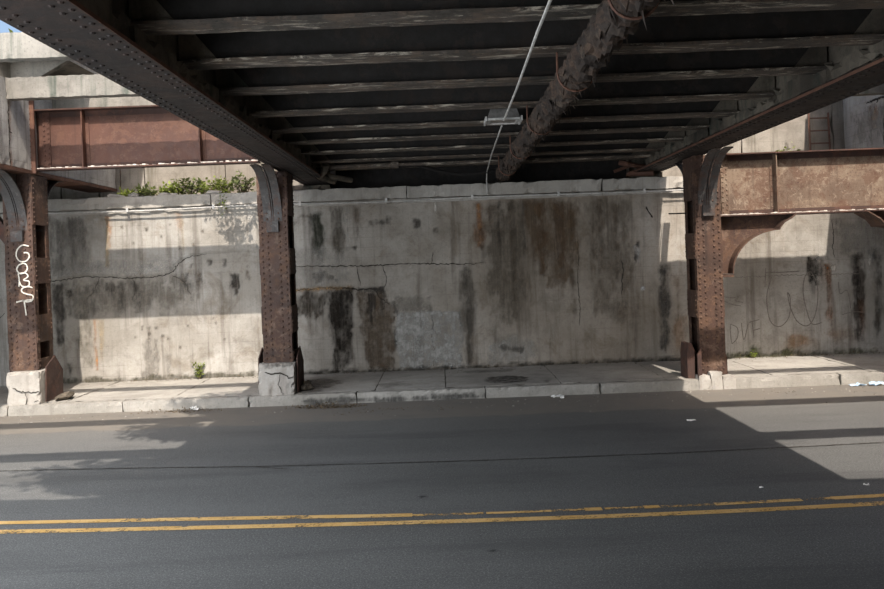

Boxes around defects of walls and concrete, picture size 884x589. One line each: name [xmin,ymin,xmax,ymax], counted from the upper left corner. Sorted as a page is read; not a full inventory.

crack [866,96,884,141]
crack [52,254,205,300]
leakage [311,209,345,254]
leakage [297,287,398,391]
crack [297,255,482,304]
leakage [488,201,578,316]
leakage [659,266,670,350]
leakage [840,223,882,340]